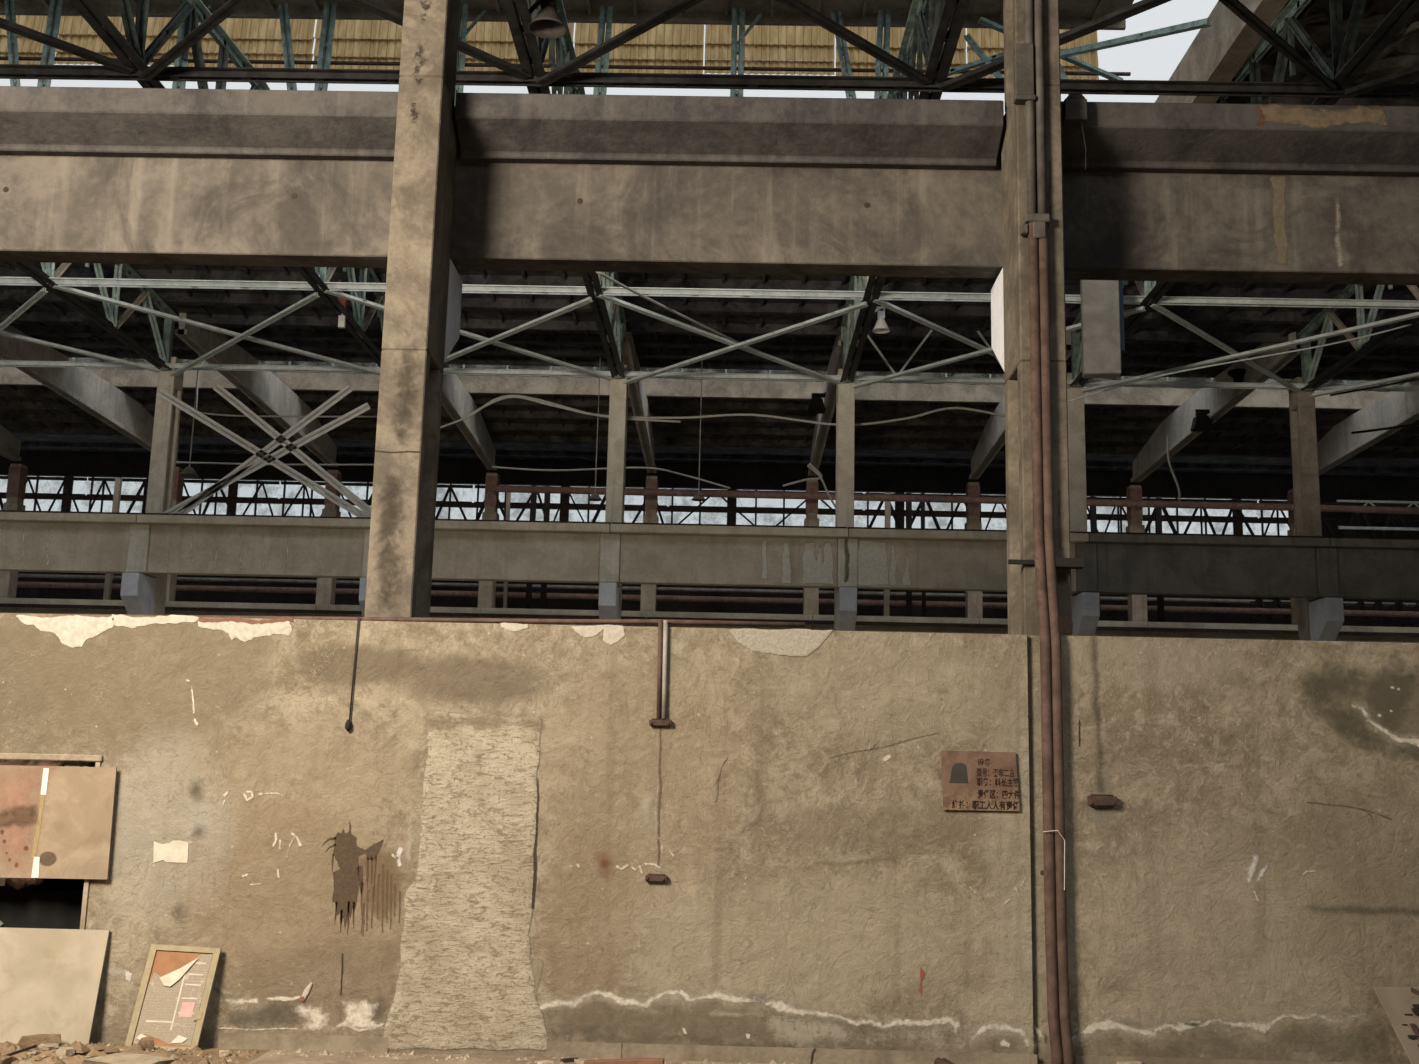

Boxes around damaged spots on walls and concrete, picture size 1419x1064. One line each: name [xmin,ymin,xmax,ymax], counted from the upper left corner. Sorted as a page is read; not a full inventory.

spalling [16,614,293,648]
damp [1310,673,1419,759]
damp [322,820,401,936]
peeling [392,836,412,867]
efflorescence [538,990,1042,1047]
efflorescence [1072,1011,1358,1043]